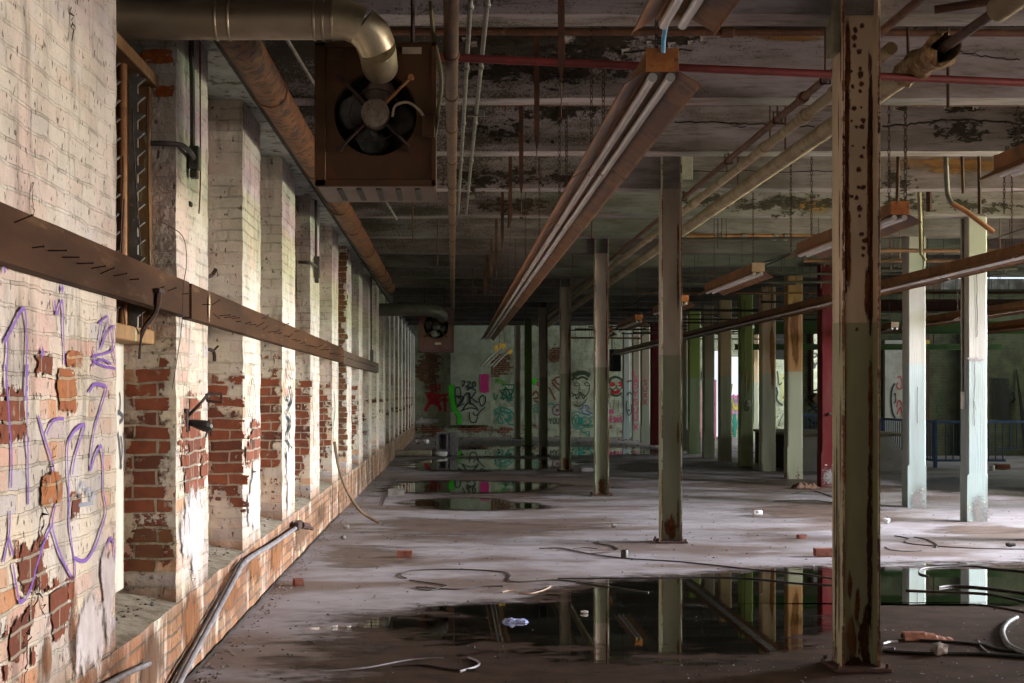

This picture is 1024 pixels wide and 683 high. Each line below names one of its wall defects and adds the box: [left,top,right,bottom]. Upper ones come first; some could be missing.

peeling [459,35,707,56]
leakage [933,114,989,143]
leakage [684,192,832,218]
corrosion [834,0,880,664]
peeling [0,384,30,444]
peeling [36,349,83,416]
peeling [41,471,85,521]
peeling [124,354,281,583]
corrosion [662,475,679,539]
peeling [4,531,74,683]